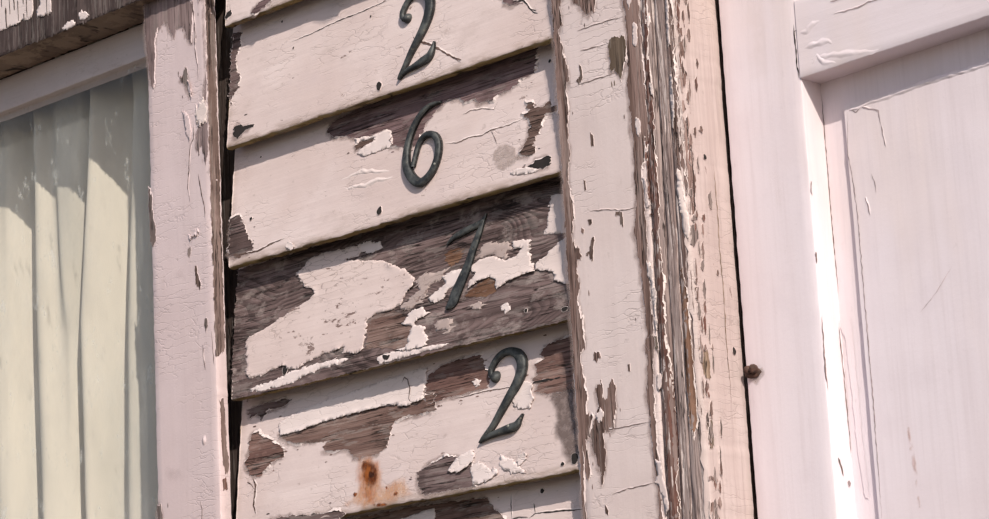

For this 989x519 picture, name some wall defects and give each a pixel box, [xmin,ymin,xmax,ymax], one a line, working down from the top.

peeling [0,0,621,519]
rust [353,462,401,506]
peeling [607,0,723,519]
crack [811,102,887,518]